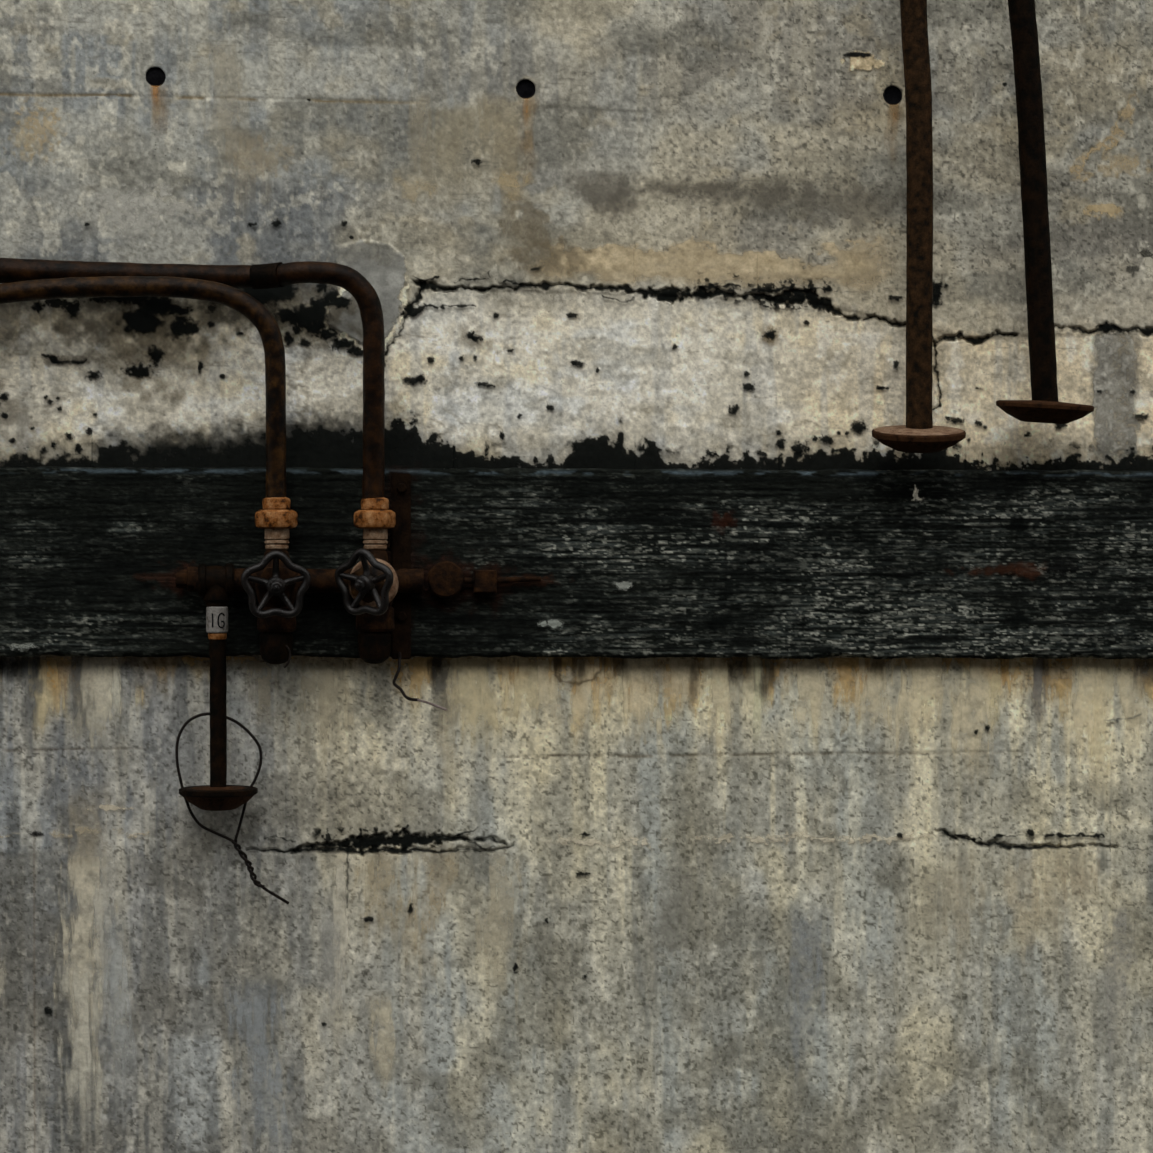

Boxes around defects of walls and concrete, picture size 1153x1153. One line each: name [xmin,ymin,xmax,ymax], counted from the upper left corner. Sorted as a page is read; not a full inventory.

flaking render [325,287,363,350]
flaking render [333,221,409,349]
crack [385,266,906,356]
crack [932,331,1018,411]
crack [1054,322,1153,336]
damp [0,656,121,747]
damp [394,657,1153,753]
crack [246,824,514,922]
crack [938,829,1141,850]
damp [54,858,129,1102]
damp [320,866,348,1009]